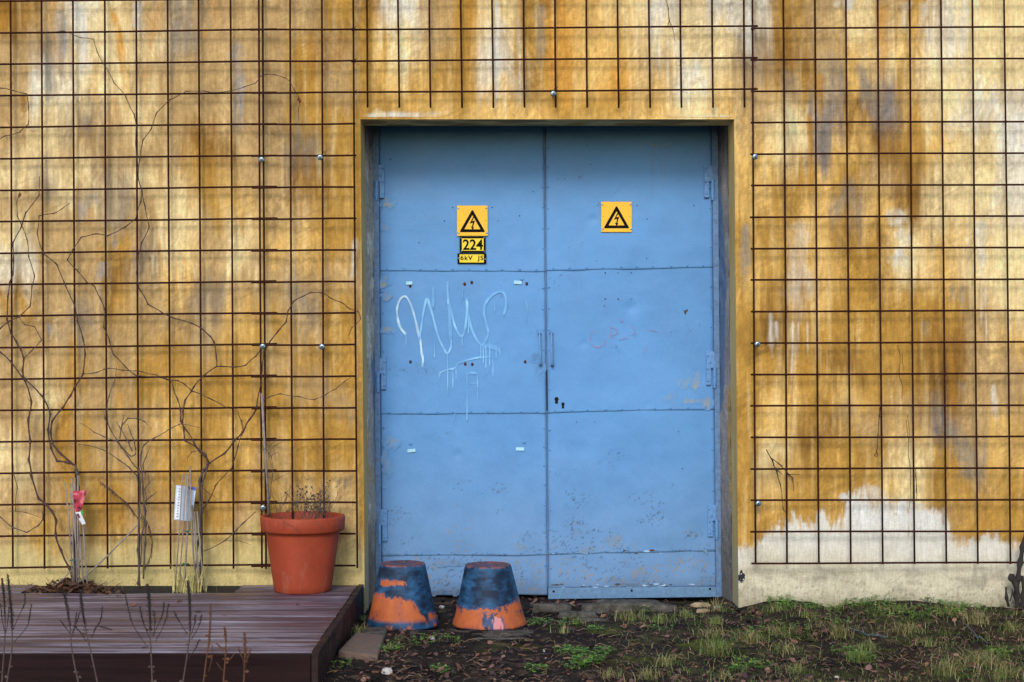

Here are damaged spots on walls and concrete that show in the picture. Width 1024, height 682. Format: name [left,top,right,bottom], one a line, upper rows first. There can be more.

rust [296,26,351,119]
rust [442,0,488,106]
rust [549,0,585,90]
damp [848,62,880,170]
rust [870,0,897,106]
damp [898,0,935,67]
damp [943,107,965,144]
damp [1001,104,1024,166]
damp [866,219,891,256]
rust [45,399,78,512]
flaking render [758,481,970,555]
peeling [1011,529,1024,557]